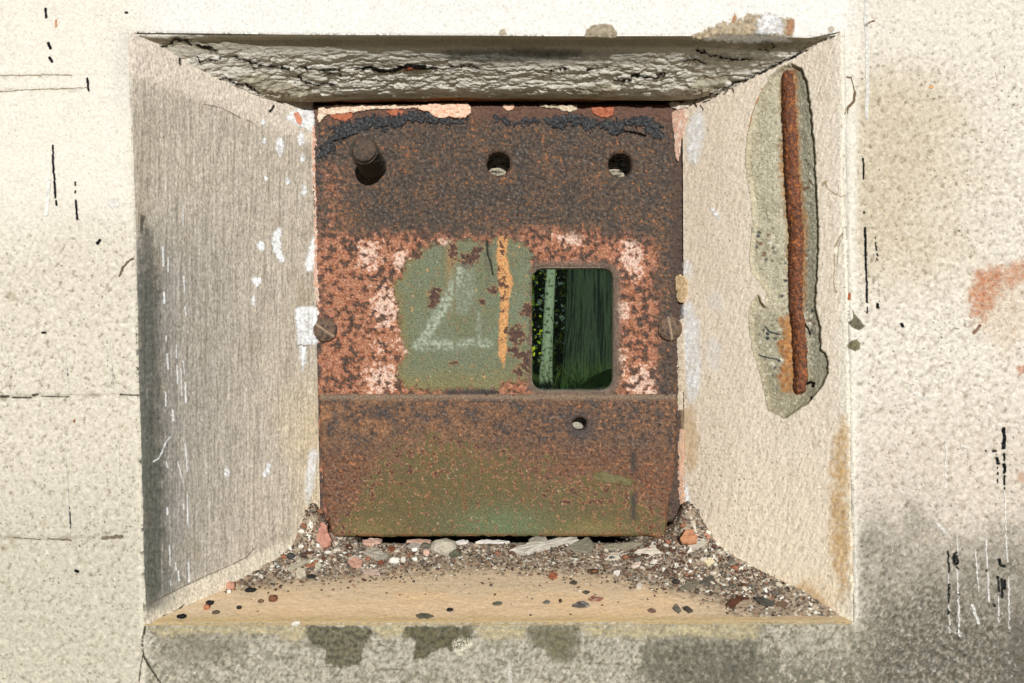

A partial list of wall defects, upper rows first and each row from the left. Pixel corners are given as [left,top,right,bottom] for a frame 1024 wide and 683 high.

peeling [692,12,794,43]
crack [160,38,479,123]
crack [550,36,835,110]
spalling [745,62,830,419]
corrosion [970,268,1024,314]
corrosion [777,315,795,392]
leakage [948,569,980,636]
leakage [975,539,1011,629]
leakage [151,623,757,683]